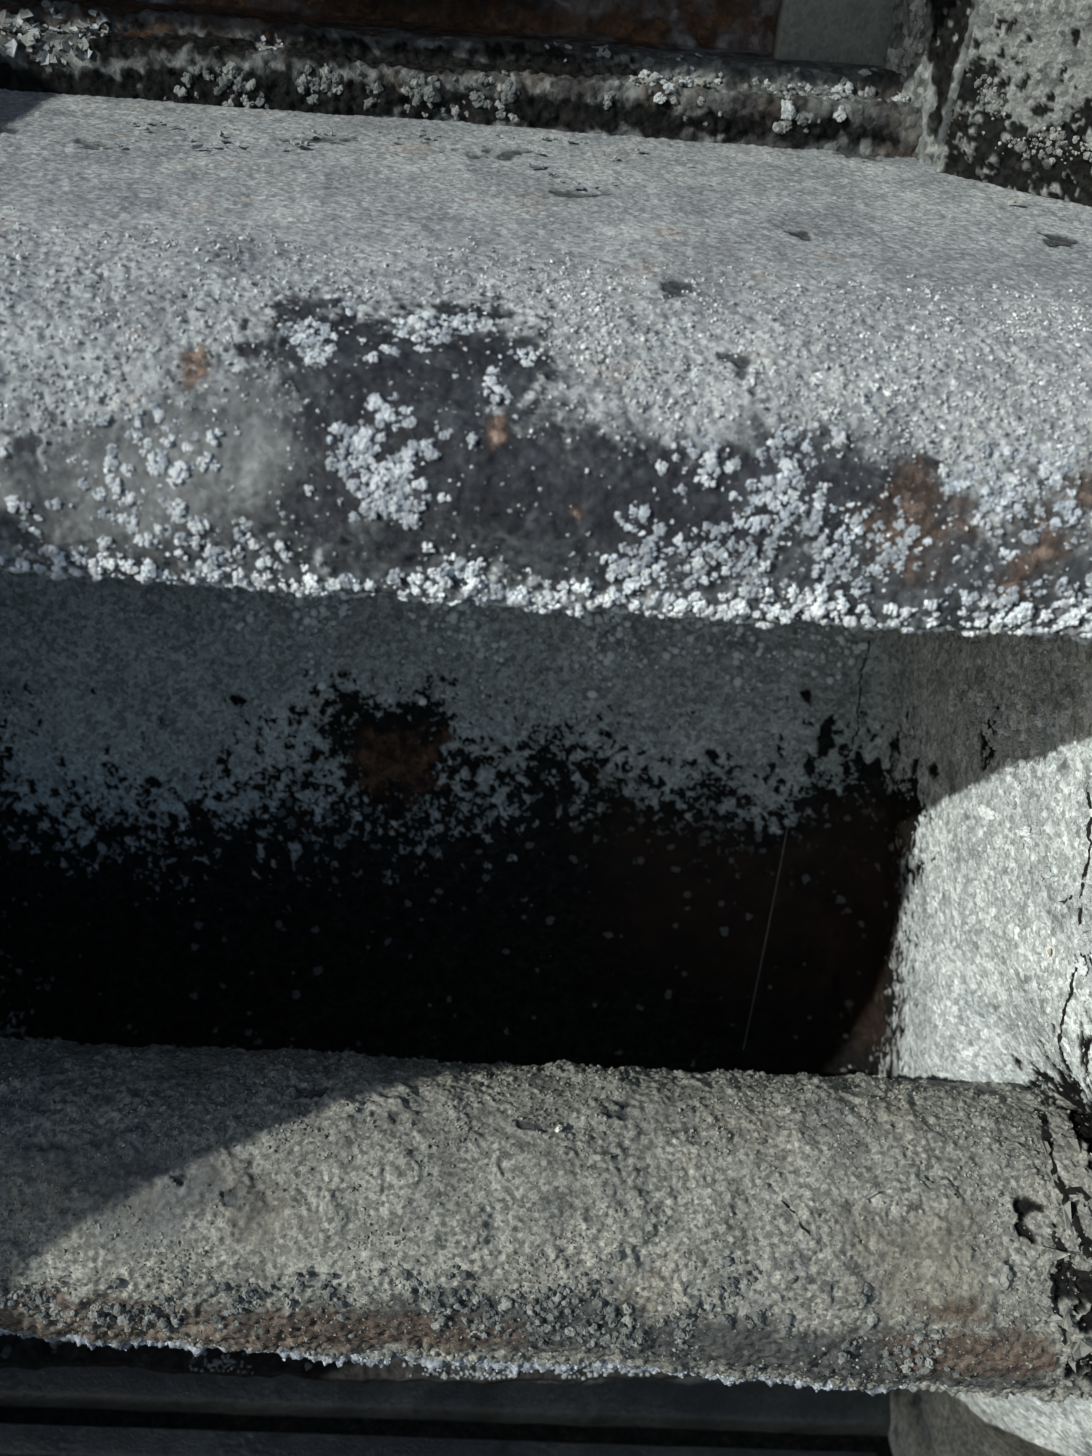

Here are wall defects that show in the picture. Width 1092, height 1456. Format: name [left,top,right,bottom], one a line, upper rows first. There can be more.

damp [966,66,1092,165]
damp [280,316,339,372]
damp [324,294,356,316]
damp [359,310,494,363]
damp [452,346,540,420]
rust [864,460,935,578]
rust [996,505,1073,598]
damp [0,370,1092,1103]
crack [1057,785,1092,1061]
crack [1032,1107,1092,1345]